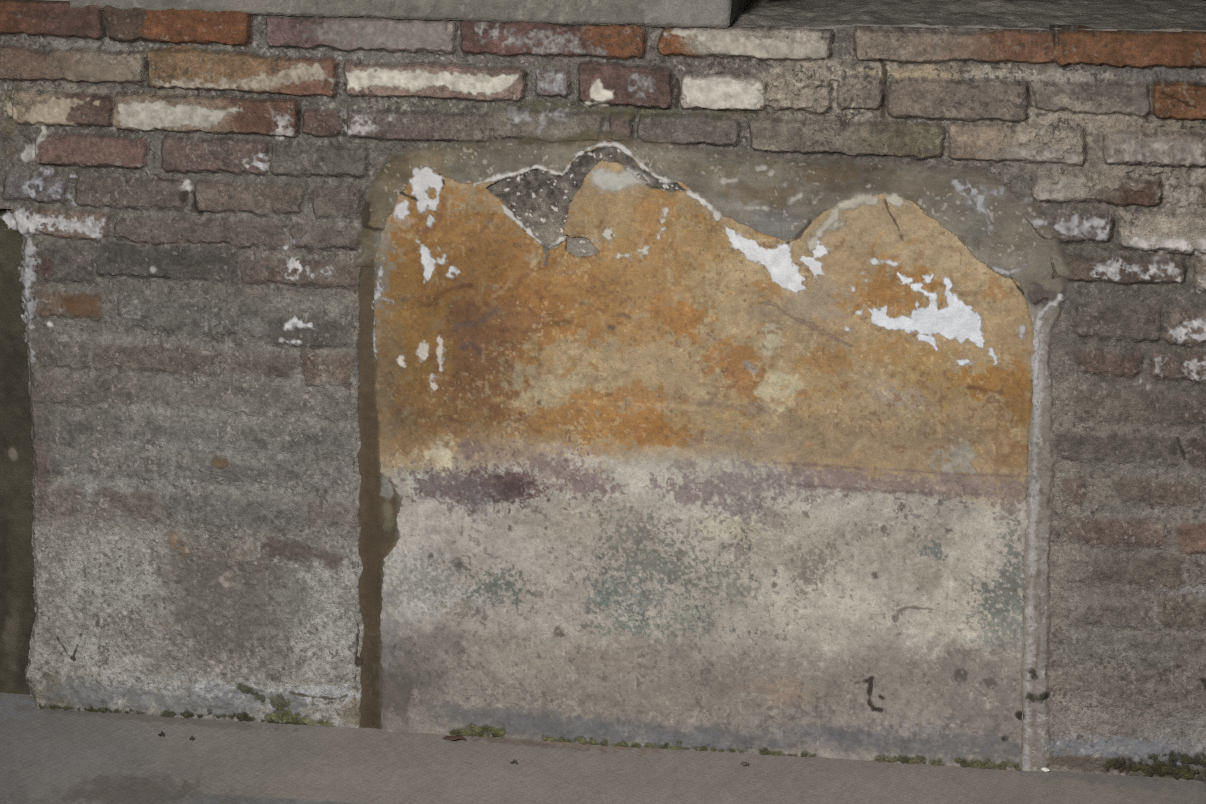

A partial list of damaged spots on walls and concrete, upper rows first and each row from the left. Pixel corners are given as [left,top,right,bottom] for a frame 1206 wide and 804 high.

efflorescence [2,126,106,362]
peeling [393,167,443,227]
peeling [416,240,460,283]
flaking render [487,146,686,259]
peeling [726,193,907,296]
efflorescence [1030,214,1110,241]
efflorescence [1090,257,1181,283]
peeling [372,255,394,357]
efflorescence [1170,319,1206,344]
peeling [397,336,444,391]
efflorescence [1184,359,1206,381]